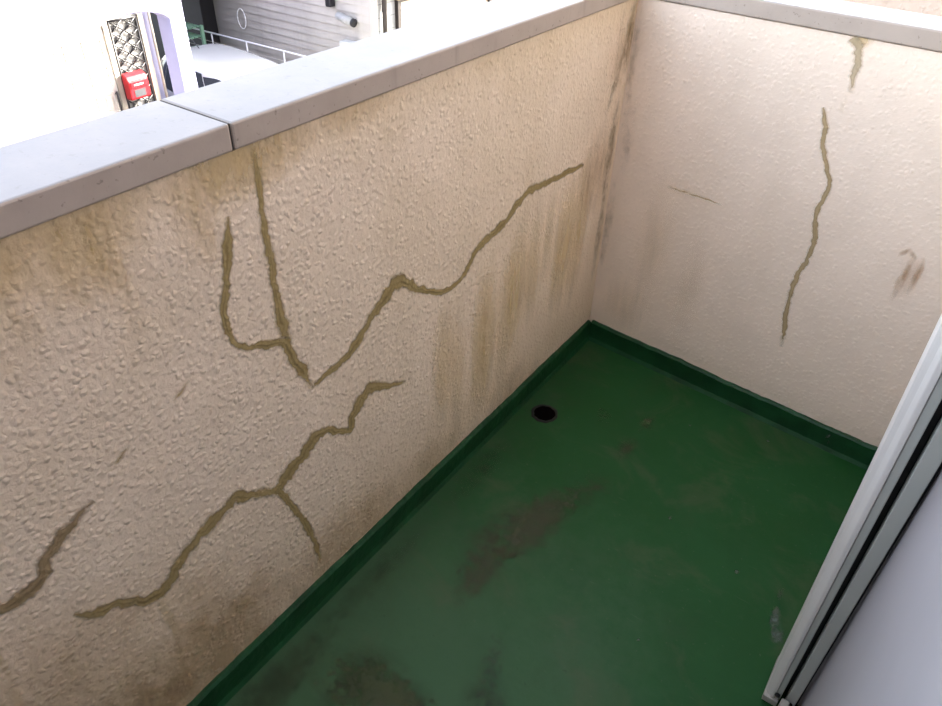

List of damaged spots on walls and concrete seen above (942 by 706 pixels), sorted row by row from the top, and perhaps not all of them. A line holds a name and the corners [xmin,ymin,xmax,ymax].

crack [220,153,583,387]
crack [782,107,832,339]
crack [0,502,93,614]
crack [74,381,405,619]